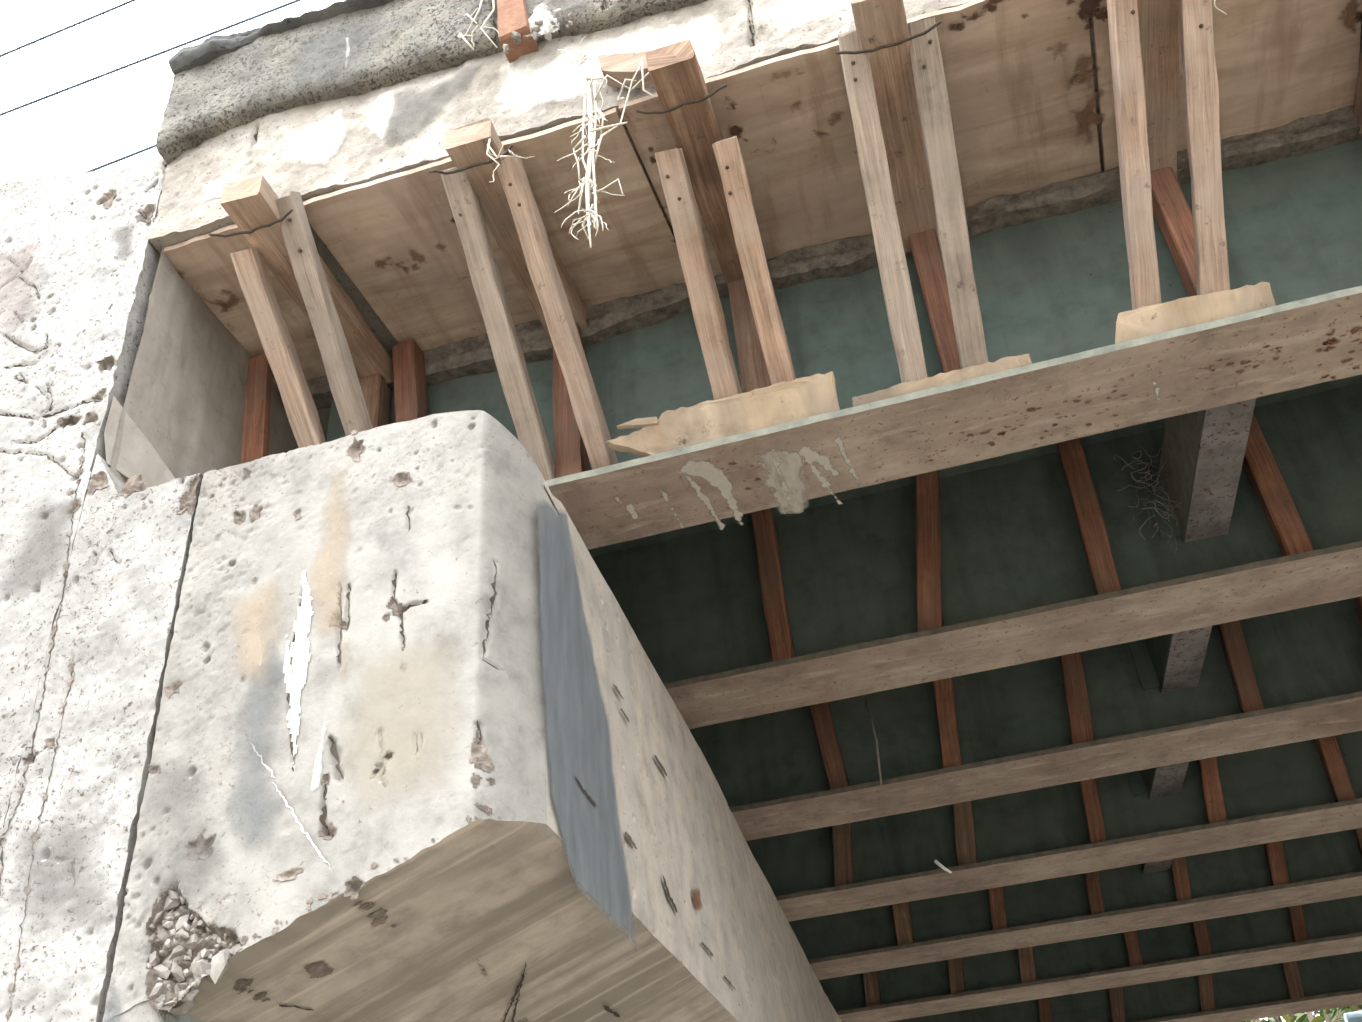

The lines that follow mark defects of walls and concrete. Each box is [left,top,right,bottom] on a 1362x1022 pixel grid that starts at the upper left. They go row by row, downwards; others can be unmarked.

crack [0,258,95,1022]
crack [286,594,303,771]
crack [482,560,498,669]
crack [319,737,344,836]
flaking render [149,889,287,1015]